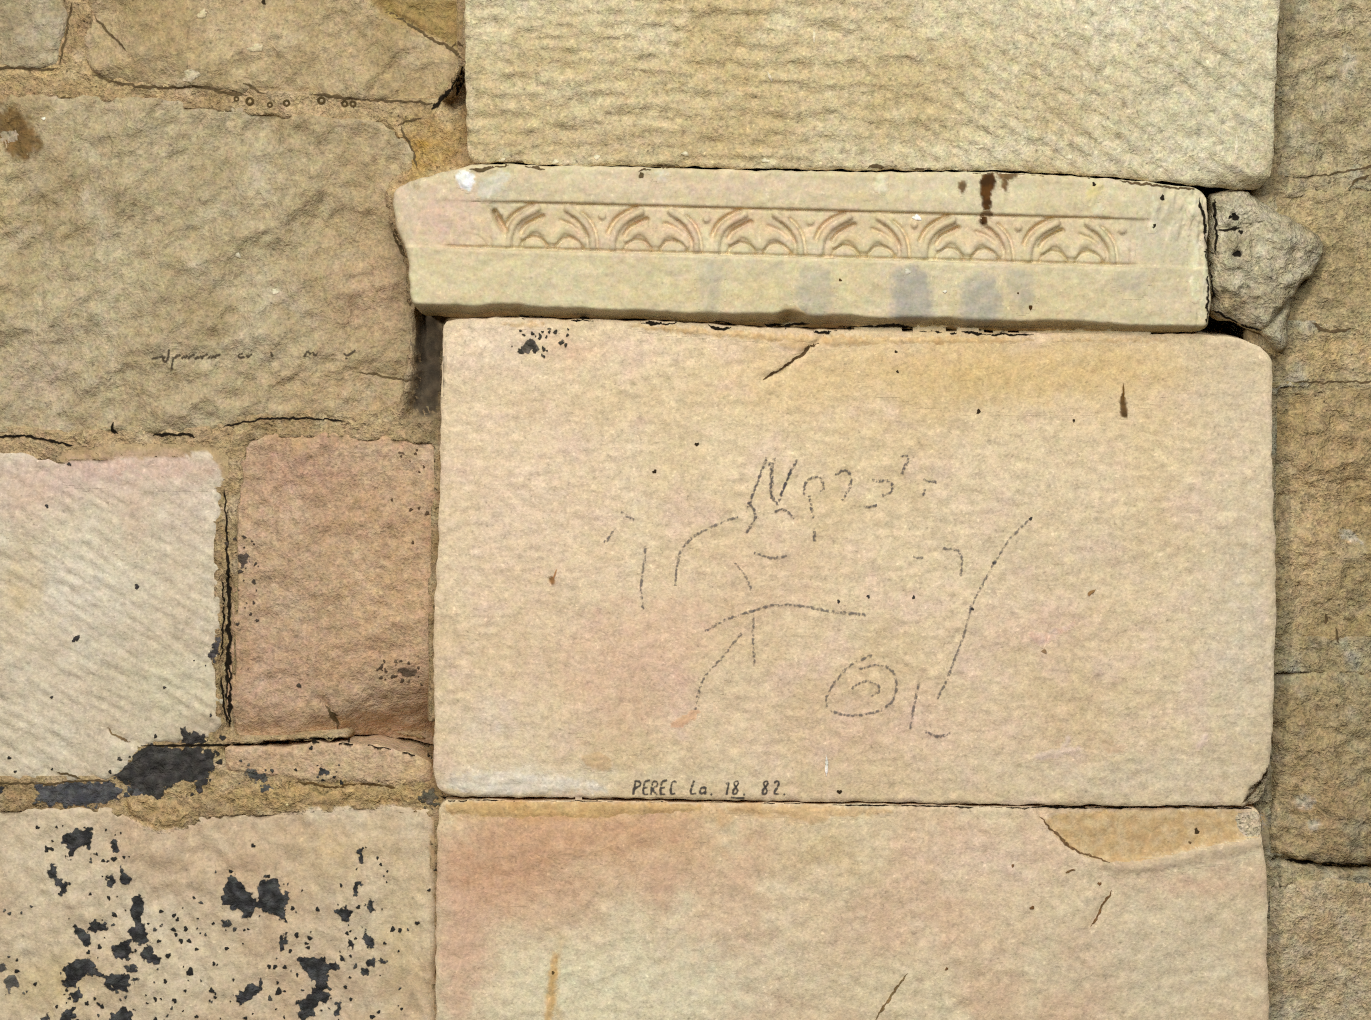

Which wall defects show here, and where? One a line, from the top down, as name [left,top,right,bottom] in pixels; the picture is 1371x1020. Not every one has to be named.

rust [956,167,1020,228]
crack [519,315,593,323]
crack [641,321,732,331]
crack [763,322,1031,380]
spalling [1041,762,1273,886]
leakage [32,726,716,1020]
leakage [0,956,37,995]